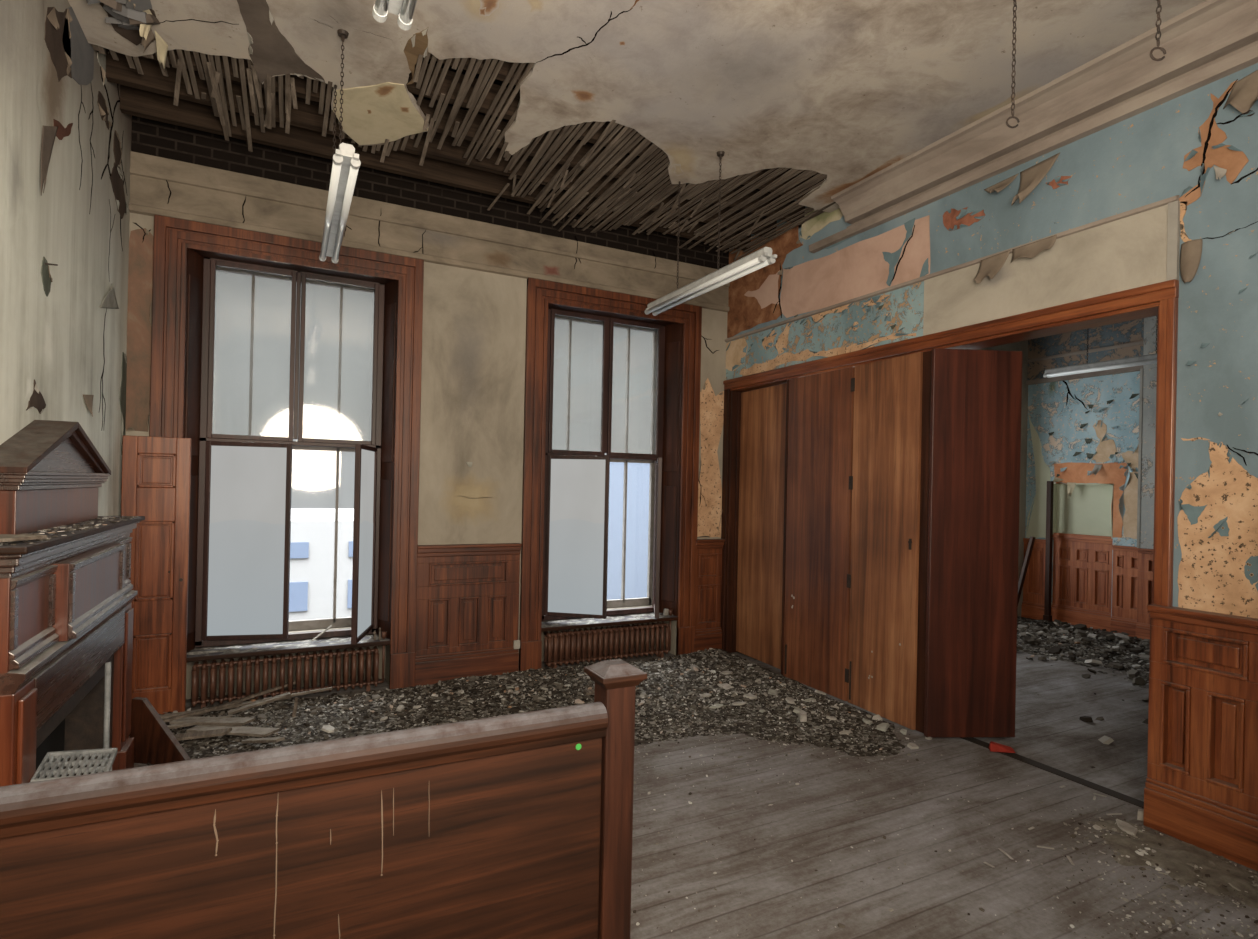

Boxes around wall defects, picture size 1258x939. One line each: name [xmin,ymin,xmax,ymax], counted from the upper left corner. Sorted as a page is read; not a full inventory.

peeling [26,379,46,414]
peeling [41,256,53,297]
peeling [41,6,128,219]
spalling [100,228,154,455]
peeling [237,0,428,145]
crack [536,0,639,63]
peeling [726,207,985,376]
spalling [1026,399,1139,539]
spalling [1179,80,1249,283]
spalling [1177,441,1258,619]
crack [1185,79,1258,197]
crack [1202,221,1258,239]